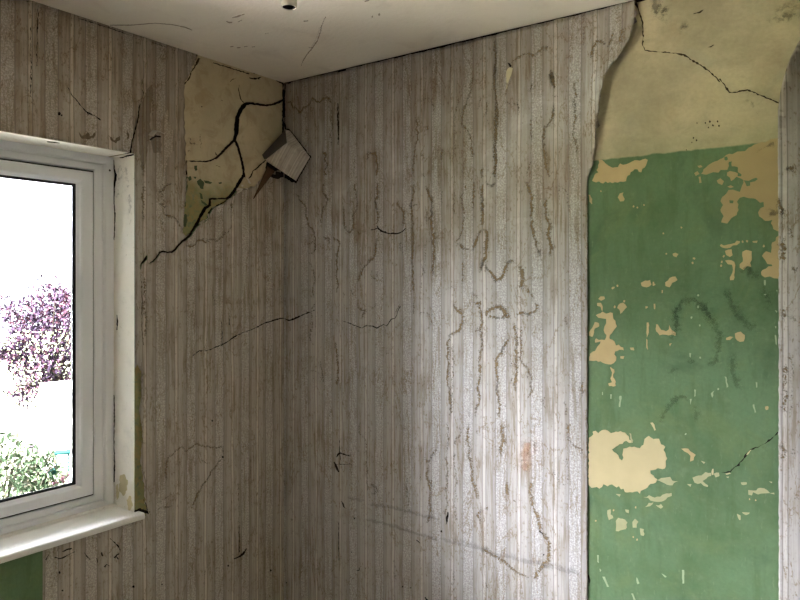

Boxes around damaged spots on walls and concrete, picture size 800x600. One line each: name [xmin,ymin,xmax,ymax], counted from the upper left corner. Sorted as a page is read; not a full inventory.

flaking render [183,55,284,236]
crack [136,0,779,345]
water stain [453,42,539,454]
water stain [526,162,553,254]
peeling [592,159,648,192]
peeling [694,138,779,280]
crack [193,310,314,356]
water stain [446,304,465,415]
peeling [589,296,634,387]
peeling [588,422,677,509]
crack [711,432,778,475]
water stain [483,483,552,579]